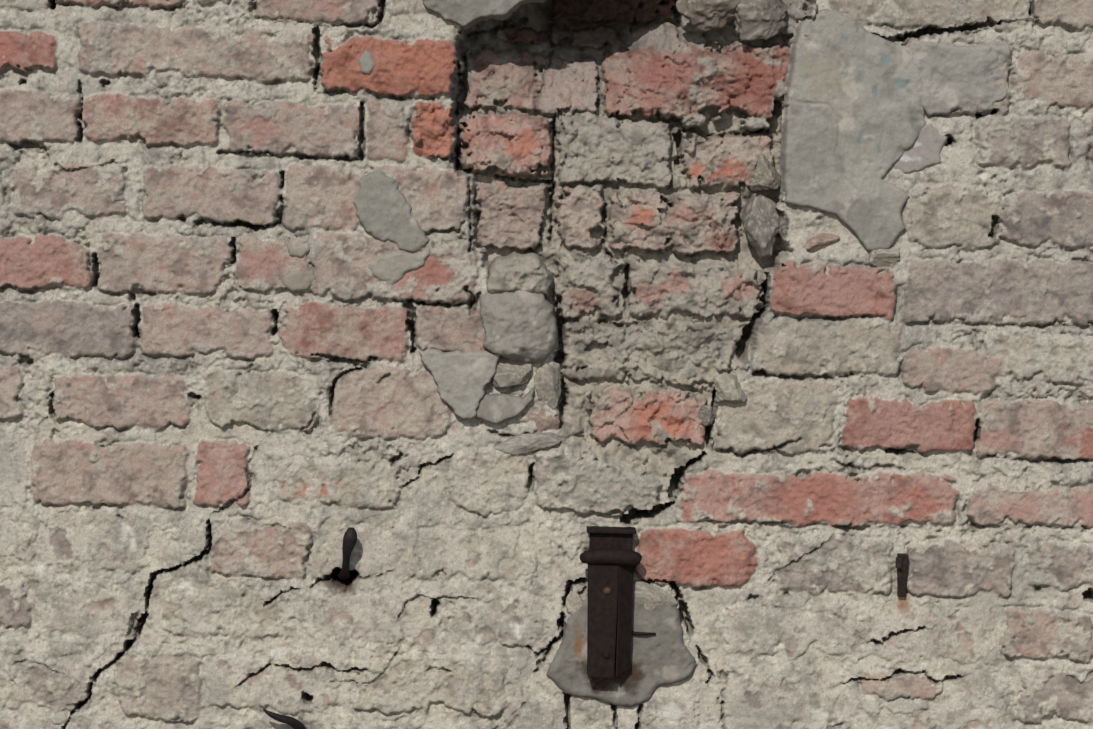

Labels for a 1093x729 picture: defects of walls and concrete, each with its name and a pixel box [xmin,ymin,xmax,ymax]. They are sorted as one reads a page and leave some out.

crack [871,17,1044,44]
spalling [452,0,816,486]
crack [733,271,771,362]
crack [620,388,719,527]
crack [13,445,307,729]
crack [263,568,397,608]
crack [236,594,486,686]
crack [641,577,730,729]
crack [840,625,962,686]
crack [609,703,645,729]